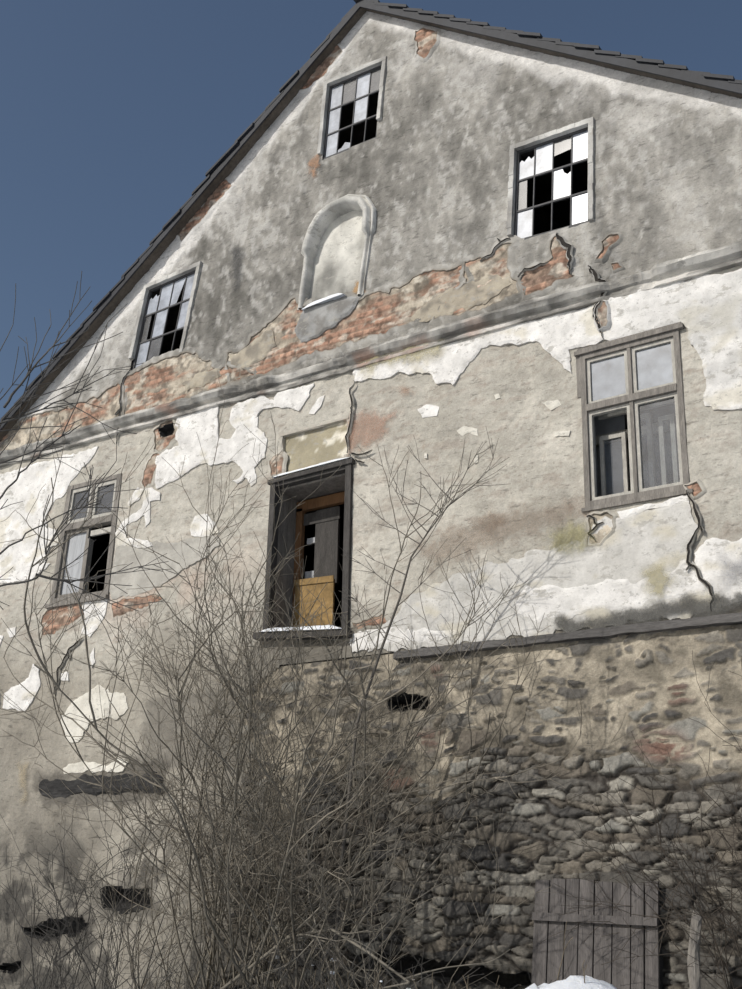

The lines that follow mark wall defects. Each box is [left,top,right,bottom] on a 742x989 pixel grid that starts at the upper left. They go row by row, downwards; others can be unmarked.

spalling [412,25,441,63]
spalling [176,177,237,247]
crack [518,233,608,339]
spalling [594,232,625,274]
peeling [353,268,742,410]
spalling [0,232,580,584]
peeling [349,478,742,653]
crack [686,490,714,611]
spalling [39,591,167,668]
peeling [0,664,41,711]
peeling [61,684,129,743]